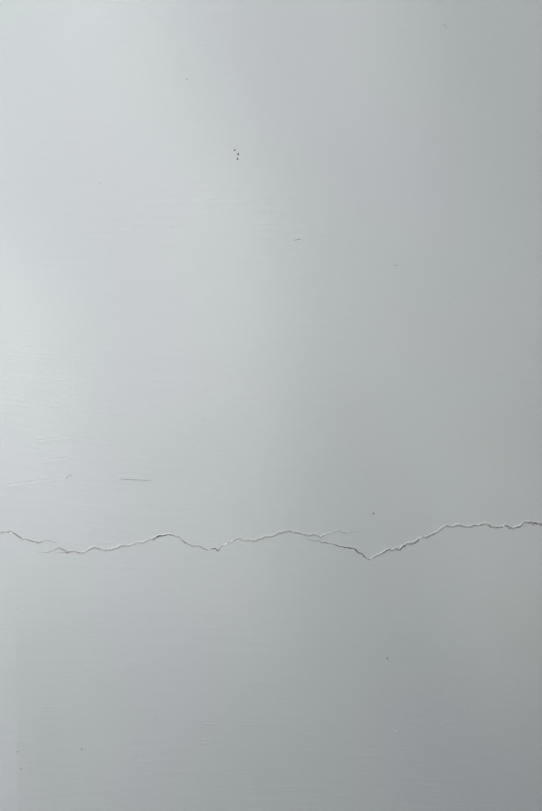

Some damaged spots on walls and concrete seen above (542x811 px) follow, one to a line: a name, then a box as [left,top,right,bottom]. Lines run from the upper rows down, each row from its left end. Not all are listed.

crack [0,520,542,560]